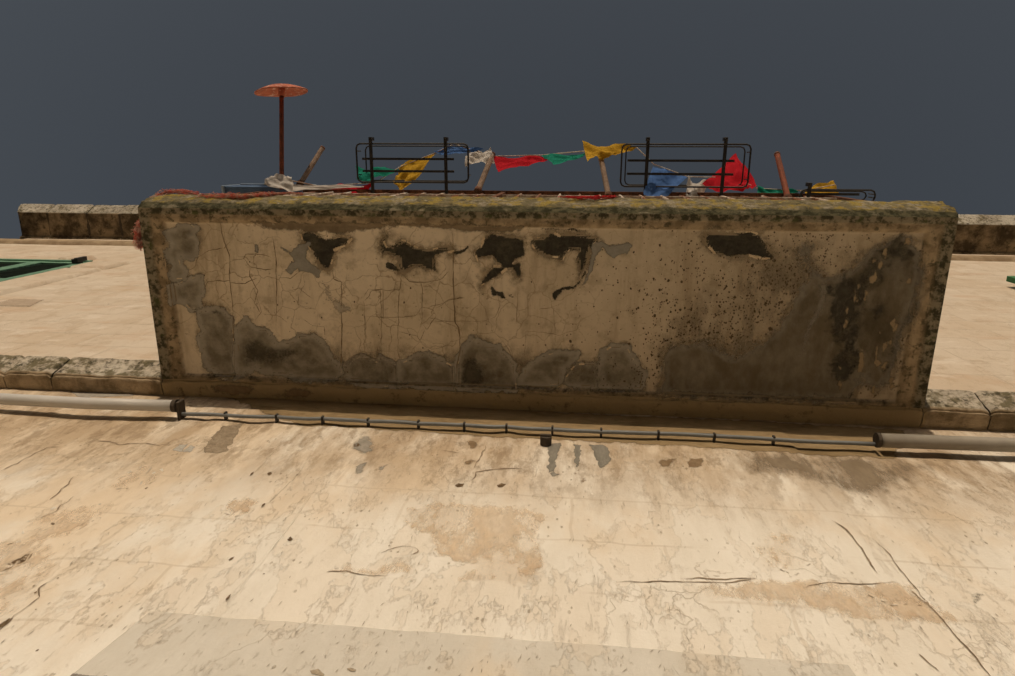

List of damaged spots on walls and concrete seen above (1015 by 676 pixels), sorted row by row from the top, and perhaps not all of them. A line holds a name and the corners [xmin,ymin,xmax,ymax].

crack [190,223,579,385]
peeling [162,223,648,394]
peeling [700,229,776,262]
leakage [566,230,926,404]
crack [327,546,419,576]
crack [620,576,750,584]